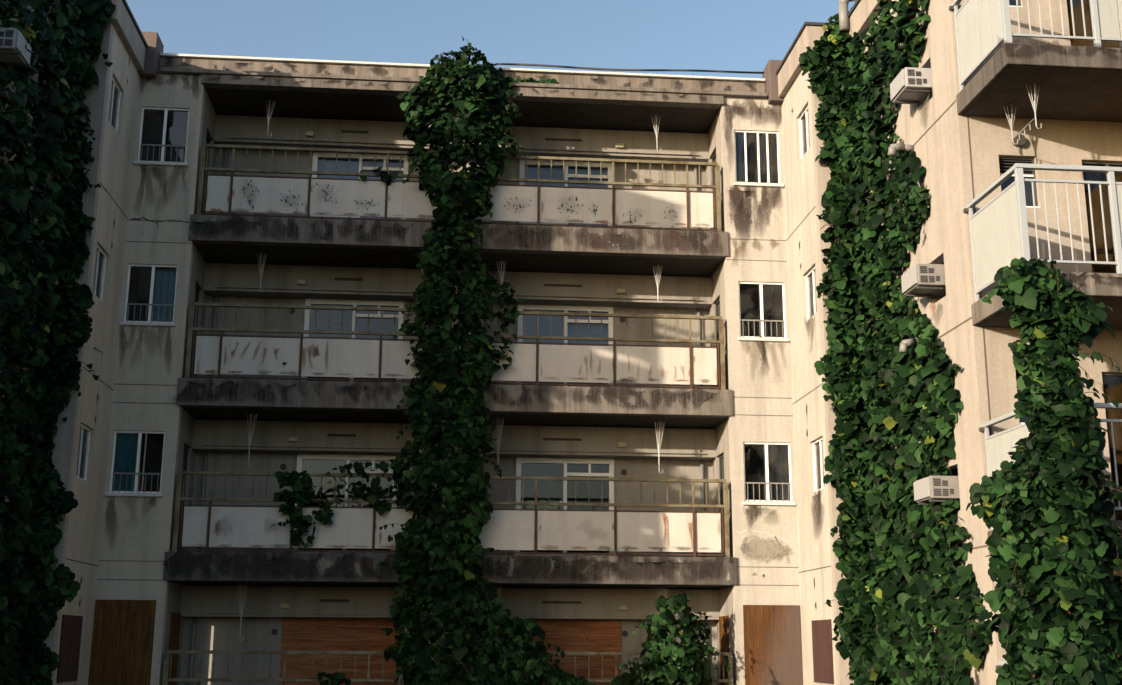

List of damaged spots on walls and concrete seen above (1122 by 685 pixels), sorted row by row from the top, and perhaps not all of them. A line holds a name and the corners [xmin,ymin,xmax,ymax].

damp [142,57,247,89]
damp [318,63,353,85]
damp [163,548,395,578]
damp [481,550,726,579]